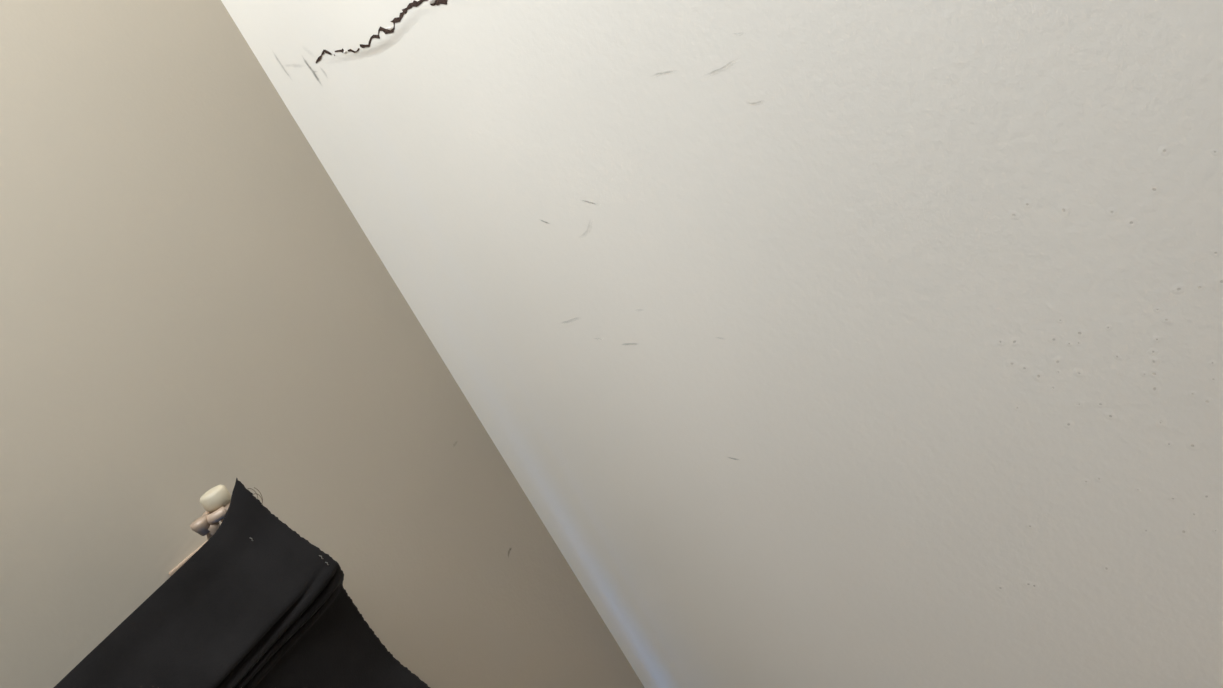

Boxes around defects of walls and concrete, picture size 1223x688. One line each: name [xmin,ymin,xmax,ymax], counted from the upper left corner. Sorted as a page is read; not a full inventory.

crack [316,0,447,63]